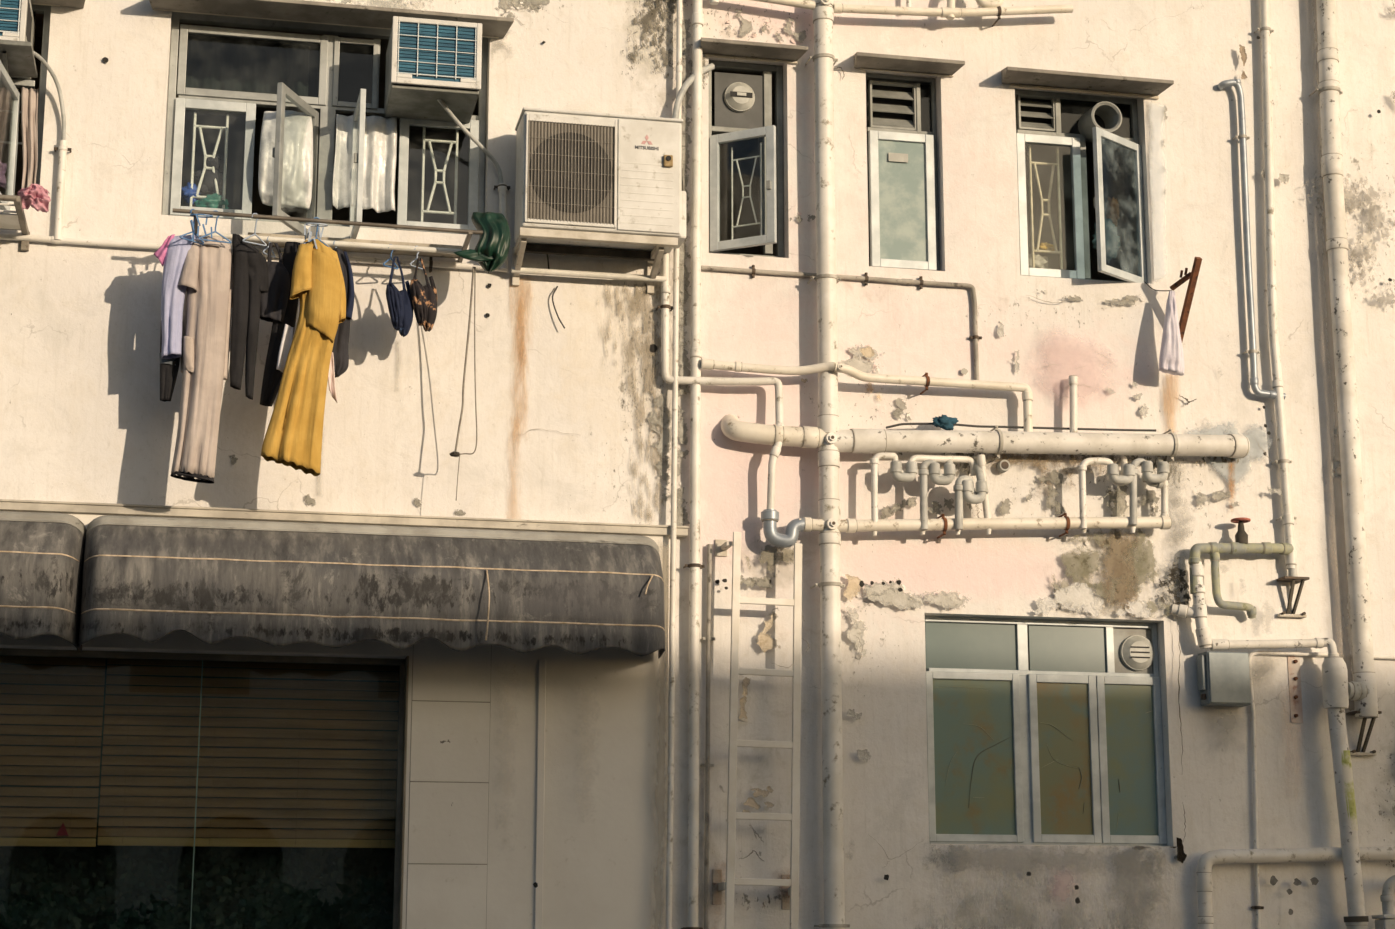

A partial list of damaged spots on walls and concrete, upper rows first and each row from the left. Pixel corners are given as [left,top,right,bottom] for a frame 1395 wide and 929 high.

peeling [496,0,550,25]
leakage [622,0,709,89]
leakage [605,284,664,519]
spalling [722,575,773,590]
peeling [756,608,792,668]
spalling [843,574,969,664]